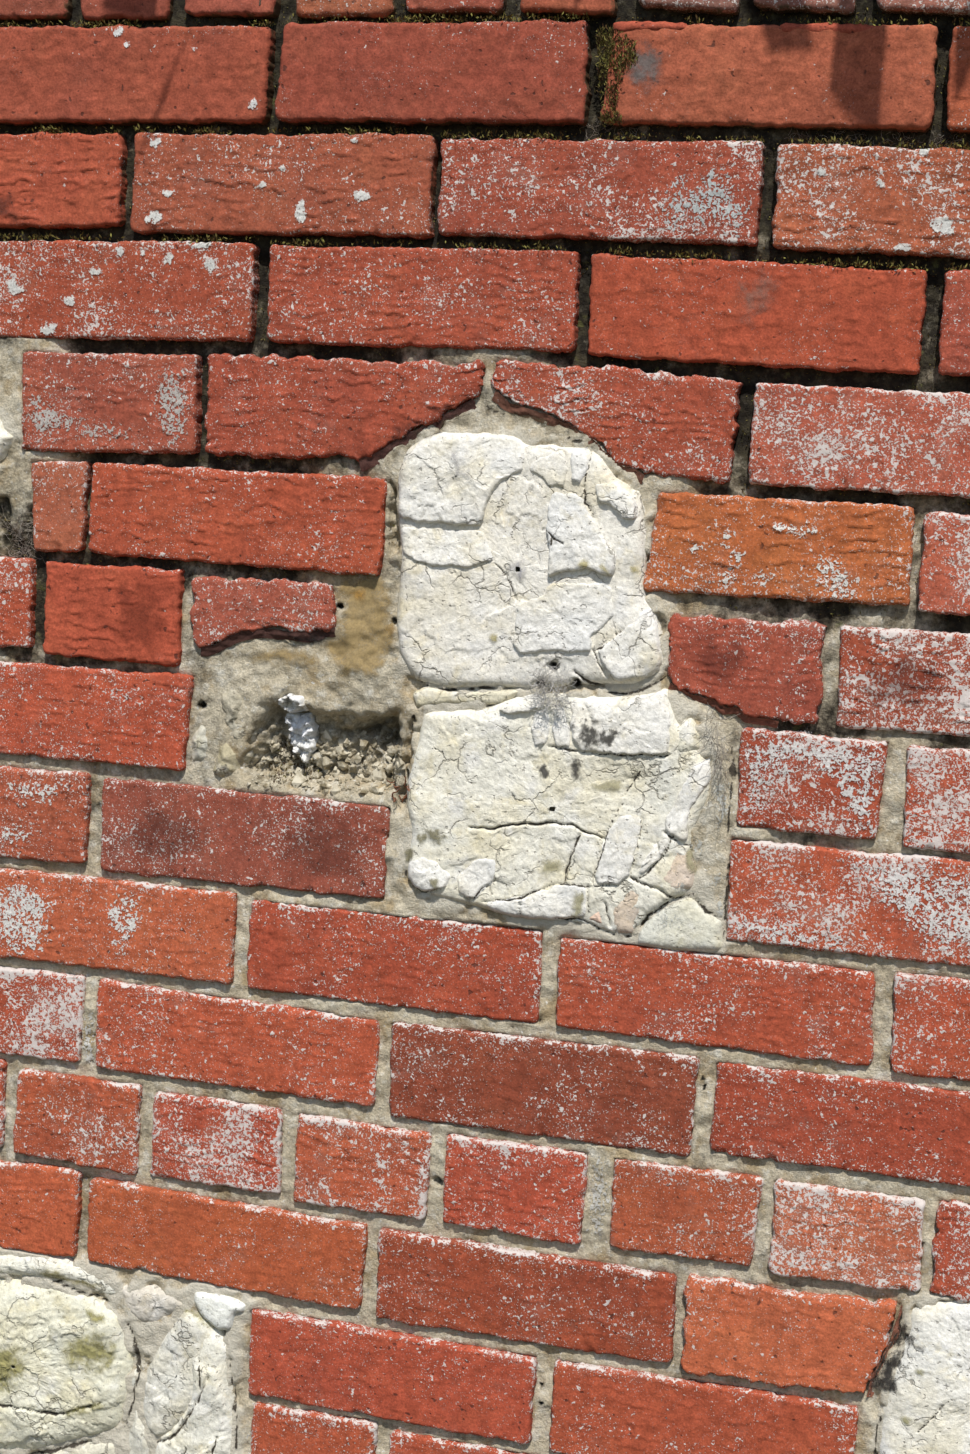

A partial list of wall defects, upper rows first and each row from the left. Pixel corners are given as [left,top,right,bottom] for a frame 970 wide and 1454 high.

crack [567,436,593,514]
spalling [200,628,336,657]
crack [575,631,664,695]
crack [411,681,493,725]
crack [470,746,737,937]
damp [0,879,60,957]
damp [104,892,142,955]
damp [727,916,849,951]
damp [837,853,970,958]
crack [0,1280,141,1454]
crack [157,1360,238,1454]